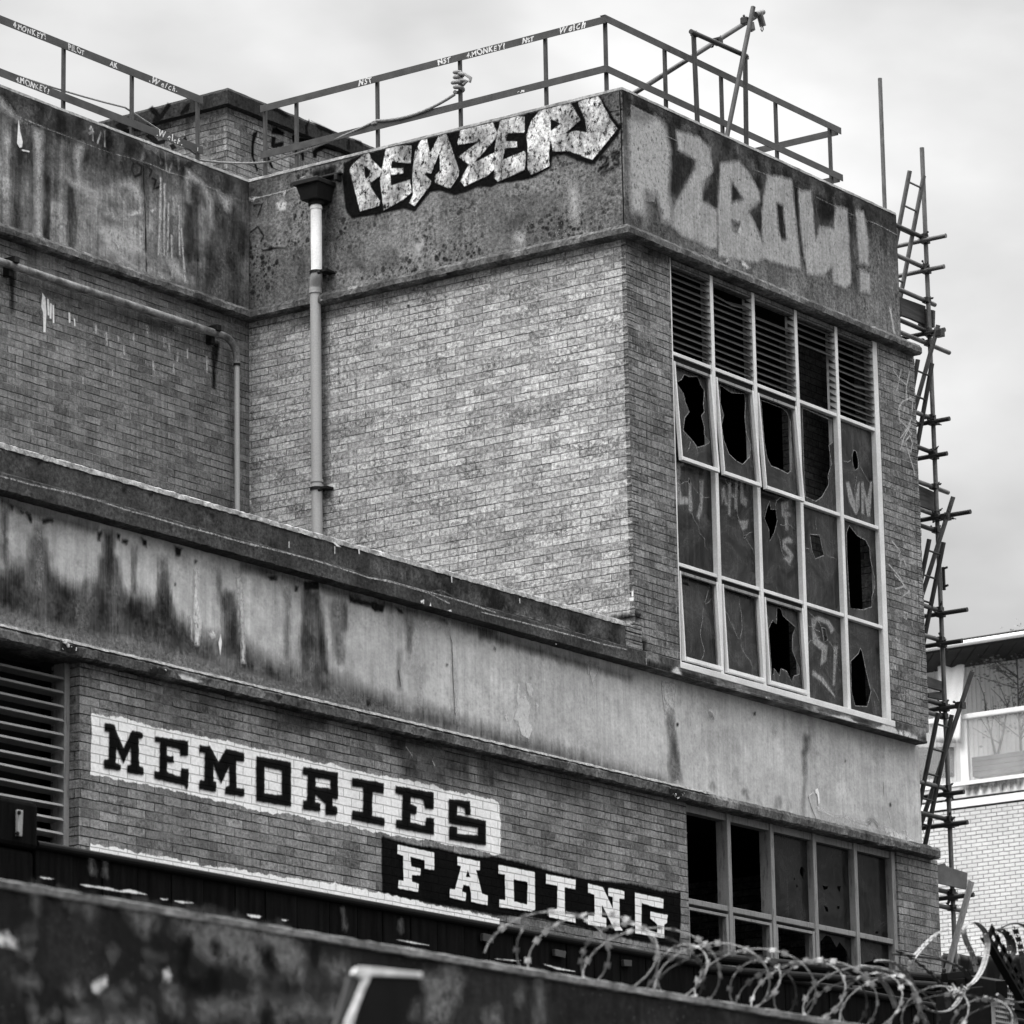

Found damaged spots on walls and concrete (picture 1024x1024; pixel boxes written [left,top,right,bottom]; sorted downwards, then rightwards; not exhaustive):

damp [10,270,180,333]
damp [2,94,242,306]
damp [0,497,640,768]
flaking render [505,683,538,738]